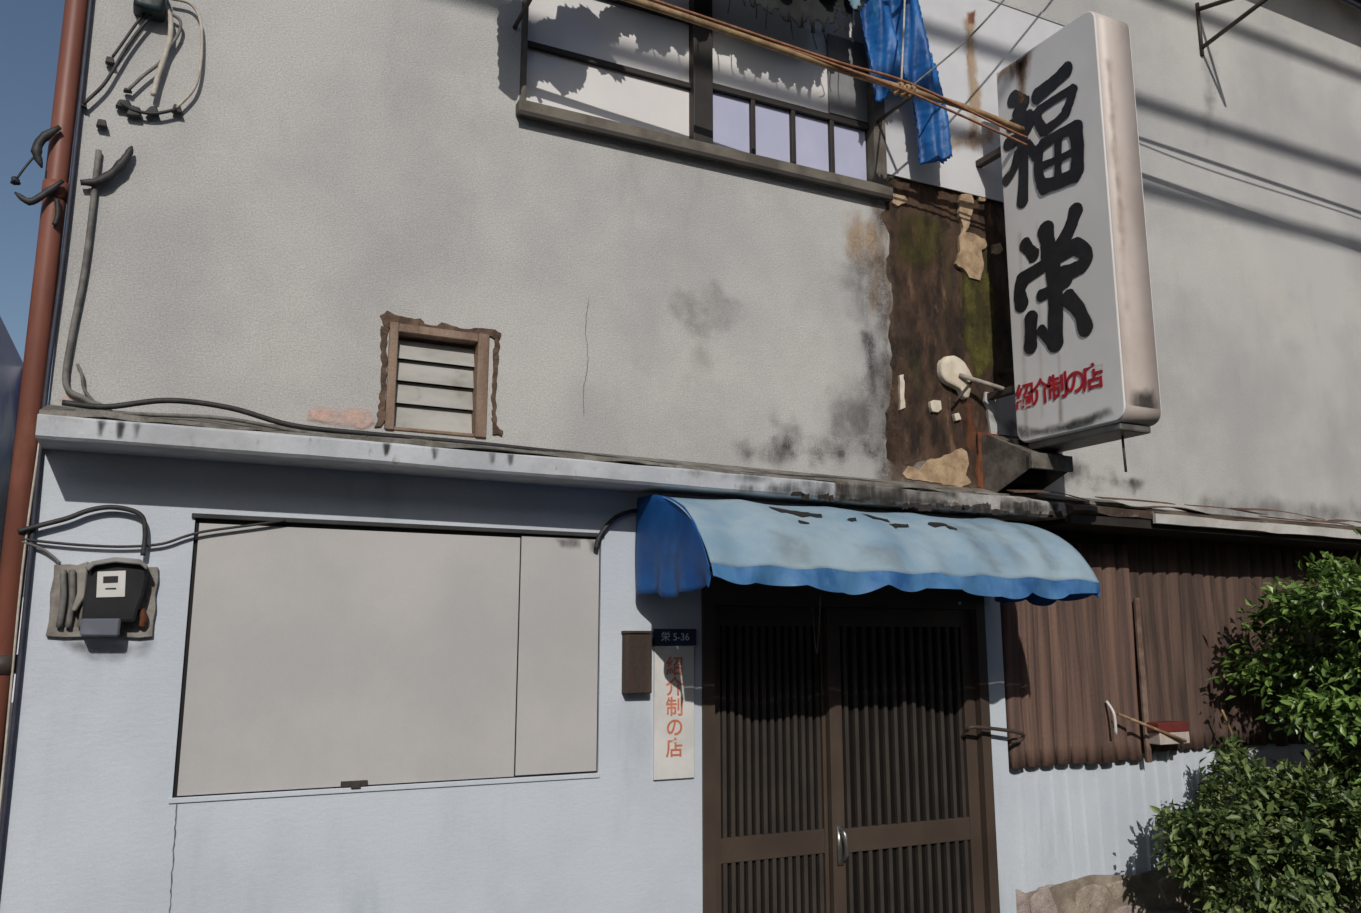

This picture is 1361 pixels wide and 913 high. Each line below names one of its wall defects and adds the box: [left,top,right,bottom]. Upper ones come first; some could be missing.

corrosion [952,11,992,147]
spalling [308,311,503,436]
crack [582,300,590,412]
flaking render [772,177,1069,522]